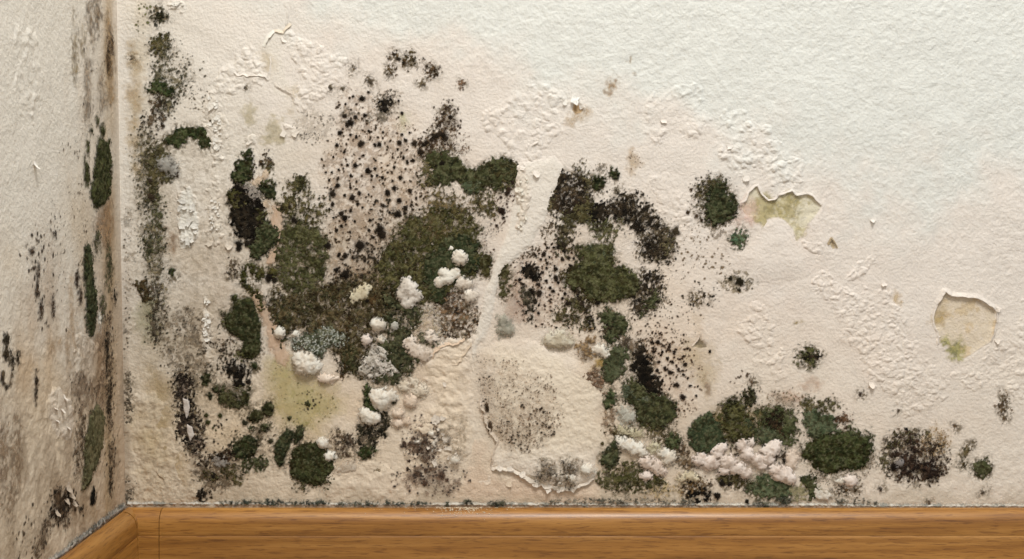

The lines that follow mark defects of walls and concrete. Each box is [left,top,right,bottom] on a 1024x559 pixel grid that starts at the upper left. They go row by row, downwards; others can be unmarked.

leakage [0,332,21,390]
leakage [12,3,473,559]
peeling [324,334,606,508]
leakage [396,79,993,508]
spalling [740,174,822,239]
spalling [931,287,1002,361]